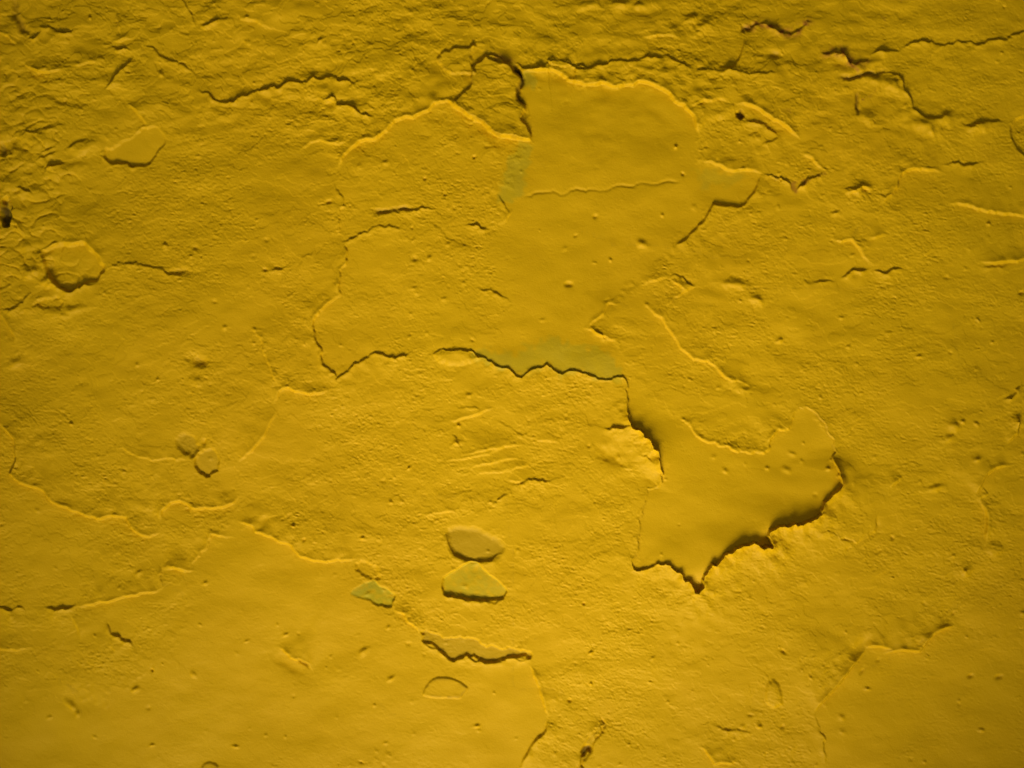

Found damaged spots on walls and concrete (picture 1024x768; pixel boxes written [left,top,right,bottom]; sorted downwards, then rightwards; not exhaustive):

crack [899,28,1024,67]
peeling [102,98,169,171]
peeling [315,93,375,124]
crack [295,88,530,168]
spalling [41,234,196,297]
peeling [430,42,852,601]
peeling [349,559,399,610]
peeling [440,563,510,609]
peeling [417,628,558,768]